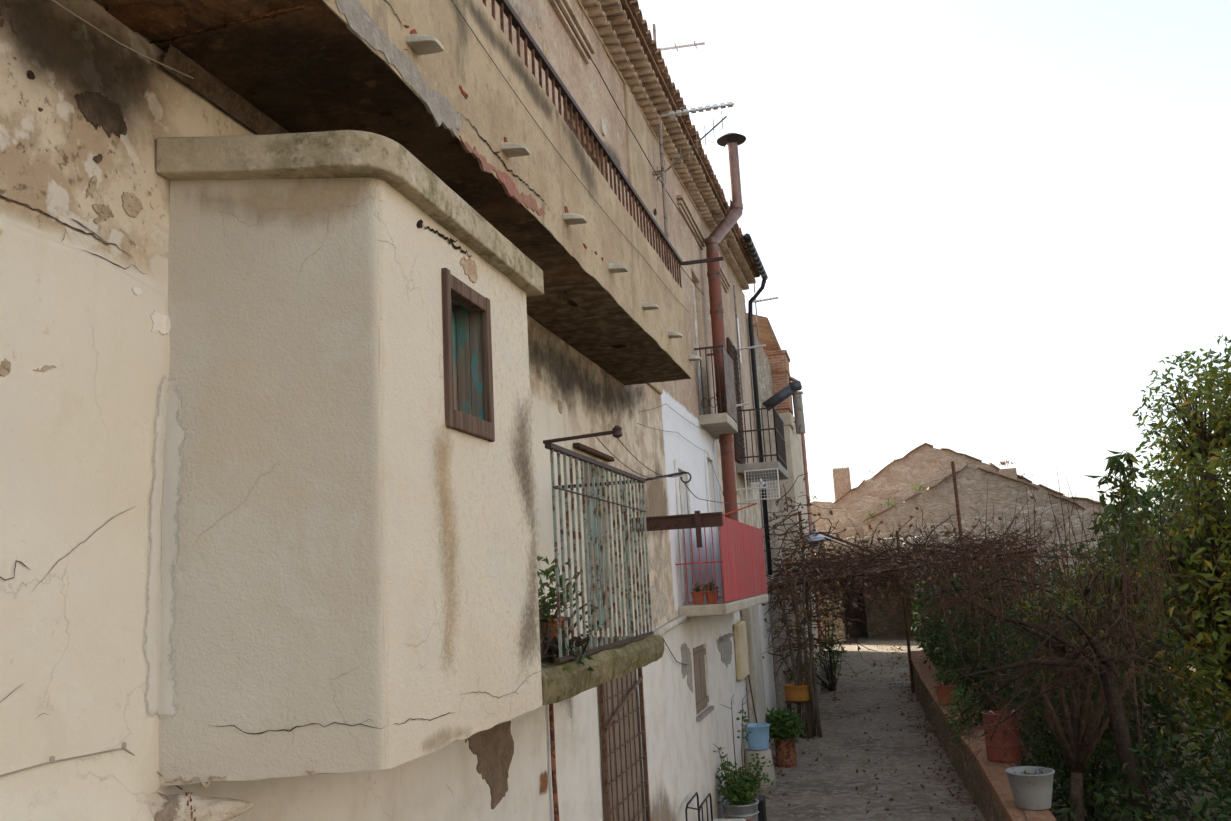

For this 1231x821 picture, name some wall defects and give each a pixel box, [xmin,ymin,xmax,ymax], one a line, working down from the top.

leakage [0,0,148,123]
spalling [74,93,128,138]
spalling [334,0,545,216]
spalling [86,154,143,224]
crack [0,195,145,274]
spalling [0,358,11,377]
crack [0,506,136,591]
crack [209,671,541,734]
spalling [465,721,514,809]